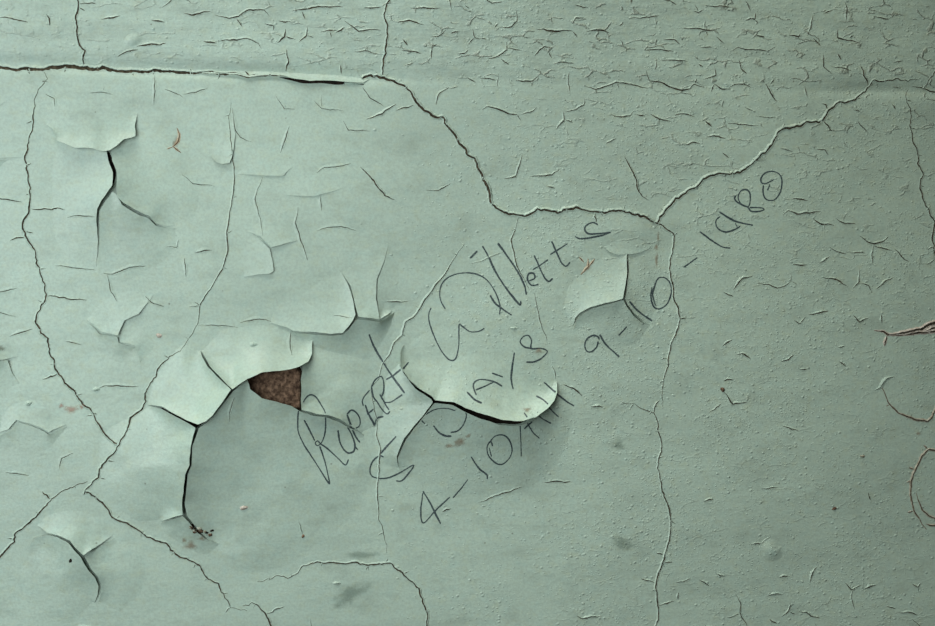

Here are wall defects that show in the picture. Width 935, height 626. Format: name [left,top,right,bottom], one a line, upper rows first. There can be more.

peeling [0,401,67,453]
peeling [19,510,146,623]
peeling [46,91,199,363]
crack [0,0,343,626]
crack [293,197,356,261]
peeling [98,243,572,573]
crack [257,244,464,626]
peeling [564,238,658,348]
crack [313,0,935,626]